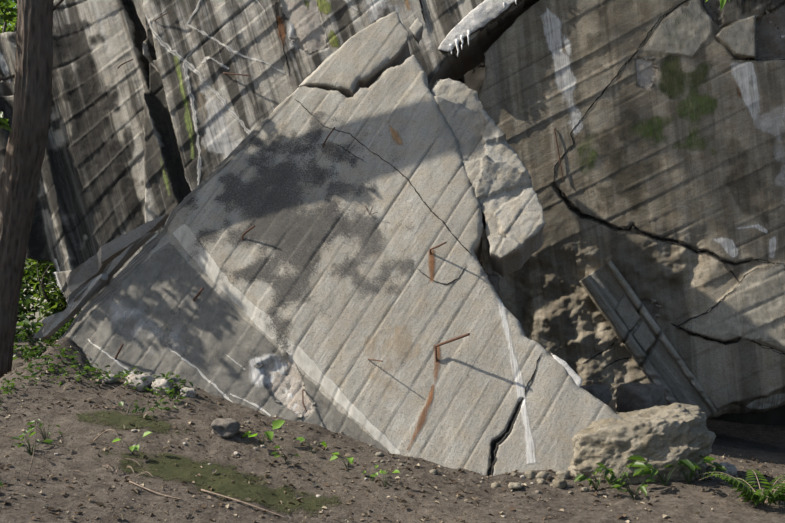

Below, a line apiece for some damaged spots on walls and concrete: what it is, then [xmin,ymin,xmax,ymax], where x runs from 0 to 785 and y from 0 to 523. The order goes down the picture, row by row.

water stain [645,0,785,119]
water stain [27,21,147,269]
water stain [61,0,414,454]
crack [295,99,472,285]
crack [554,0,785,355]
spalling [254,351,315,418]
rust [407,345,440,450]
crack [487,353,542,476]
crack [584,338,632,369]